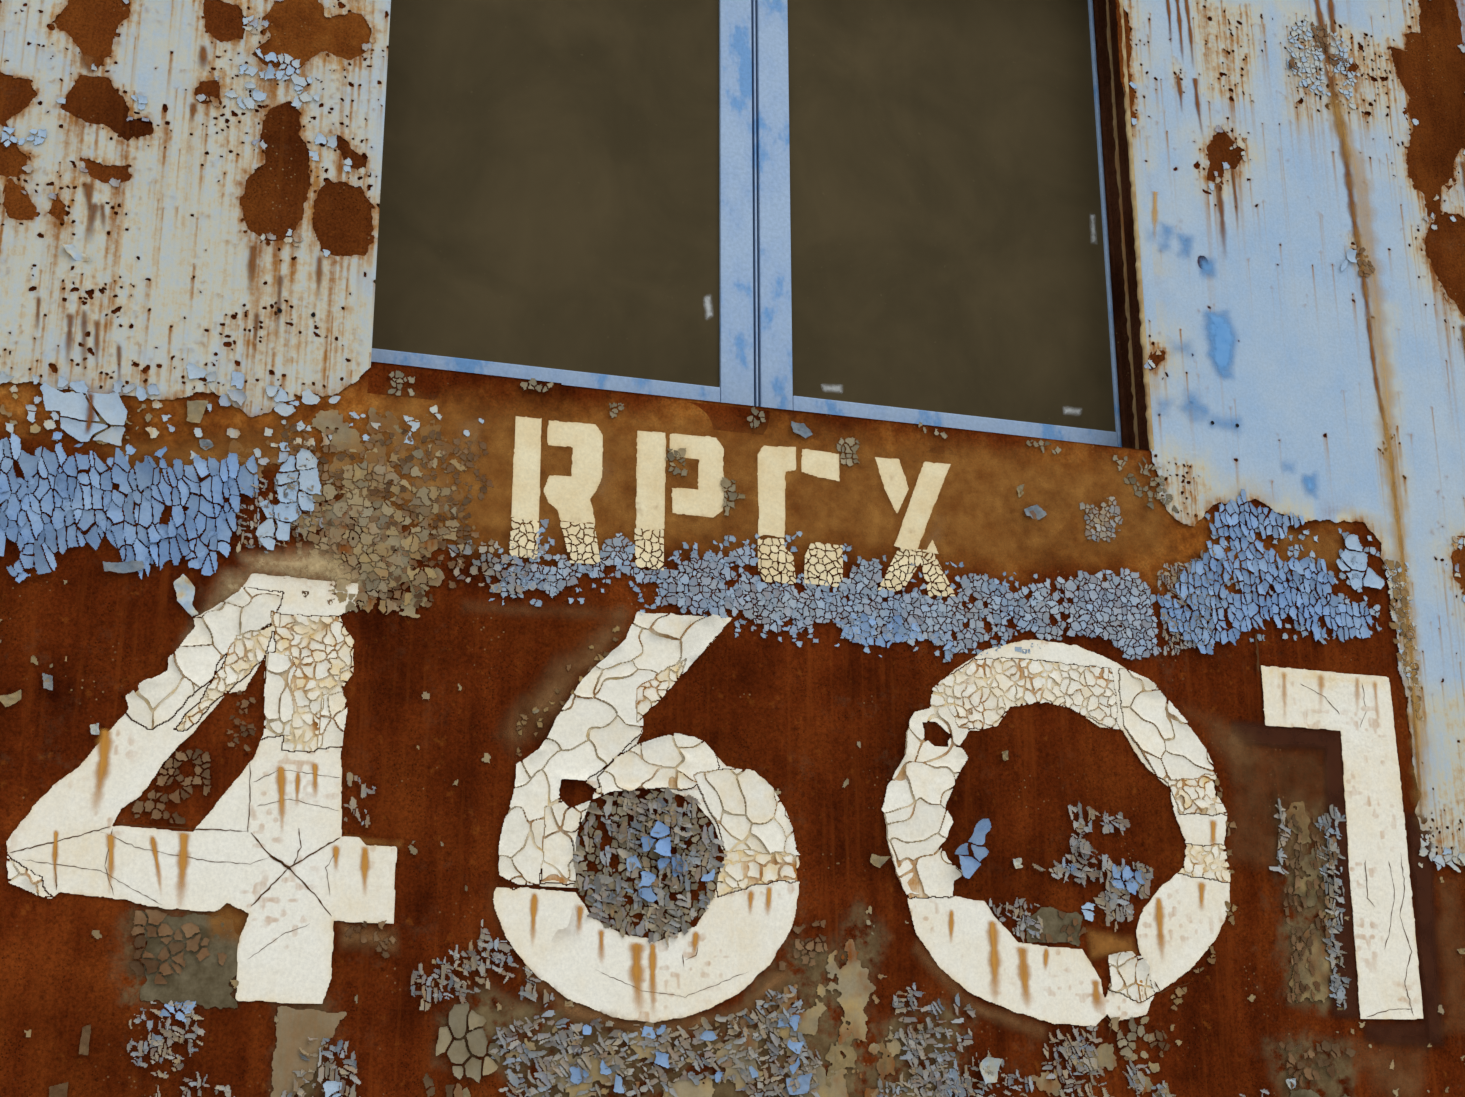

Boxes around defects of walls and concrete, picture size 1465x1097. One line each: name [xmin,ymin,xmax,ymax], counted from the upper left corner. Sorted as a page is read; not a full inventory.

corrosion [191,0,376,118]
corrosion [240,101,375,285]
corrosion [1387,0,1465,343]
corrosion [335,412,1157,552]
peeling [0,363,1424,948]
crack [10,769,340,958]
peeling [127,910,239,1097]
peeling [270,995,361,1097]
crack [601,948,741,997]
peeling [410,919,1216,1097]
peeling [1269,798,1351,1010]
corrosion [1232,722,1442,1045]